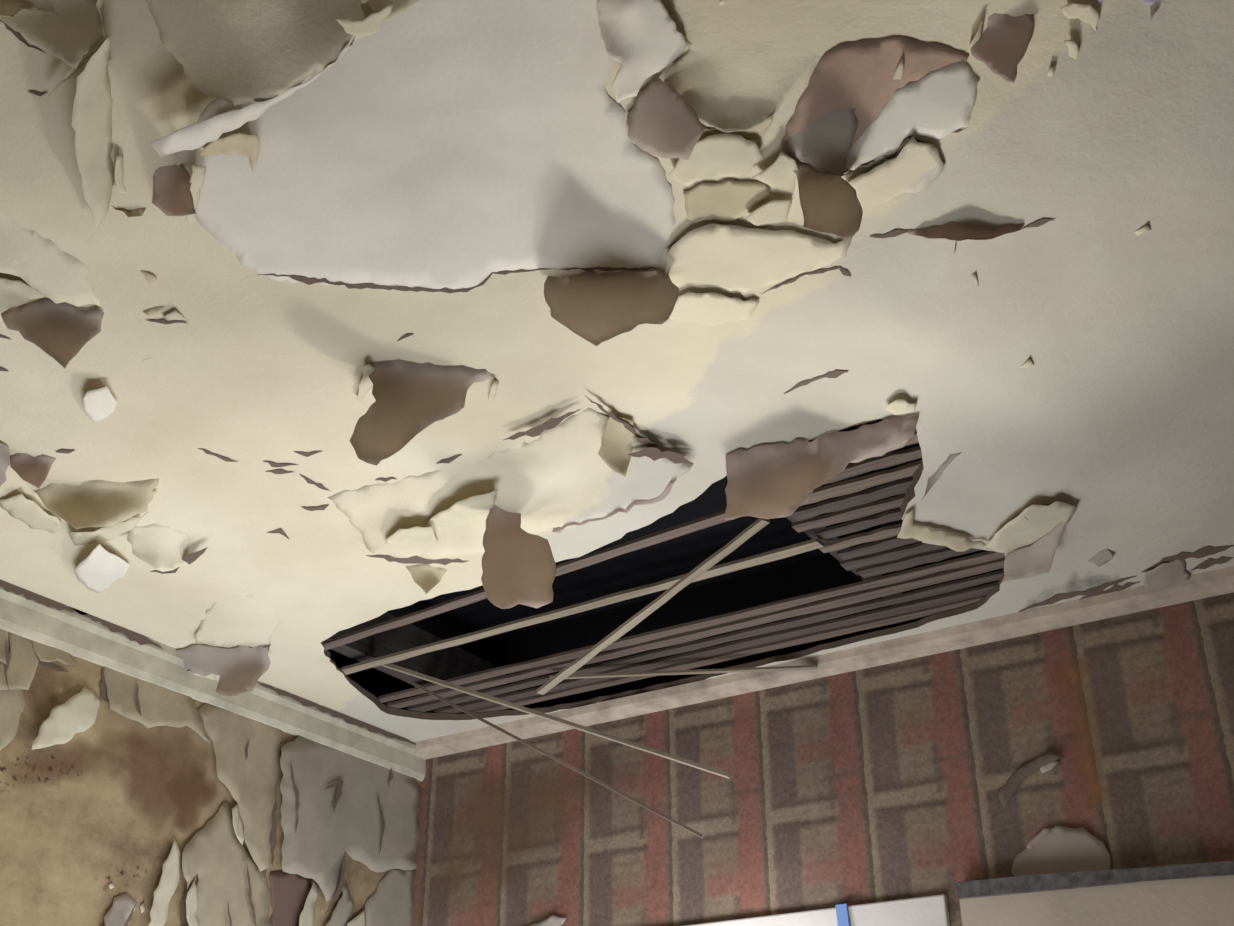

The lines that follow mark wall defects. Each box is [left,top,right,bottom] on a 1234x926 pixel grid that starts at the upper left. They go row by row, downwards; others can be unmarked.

peeling [1064,40,1079,59]
peeling [1060,0,1105,33]
peeling [1139,0,1162,24]
flaking render [0,0,1035,369]
peeling [82,386,117,422]
peeling [0,443,208,593]
peeling [327,395,694,609]
peeling [725,399,919,520]
peeling [897,452,1077,582]
peeling [0,629,78,751]
peeling [31,595,422,926]